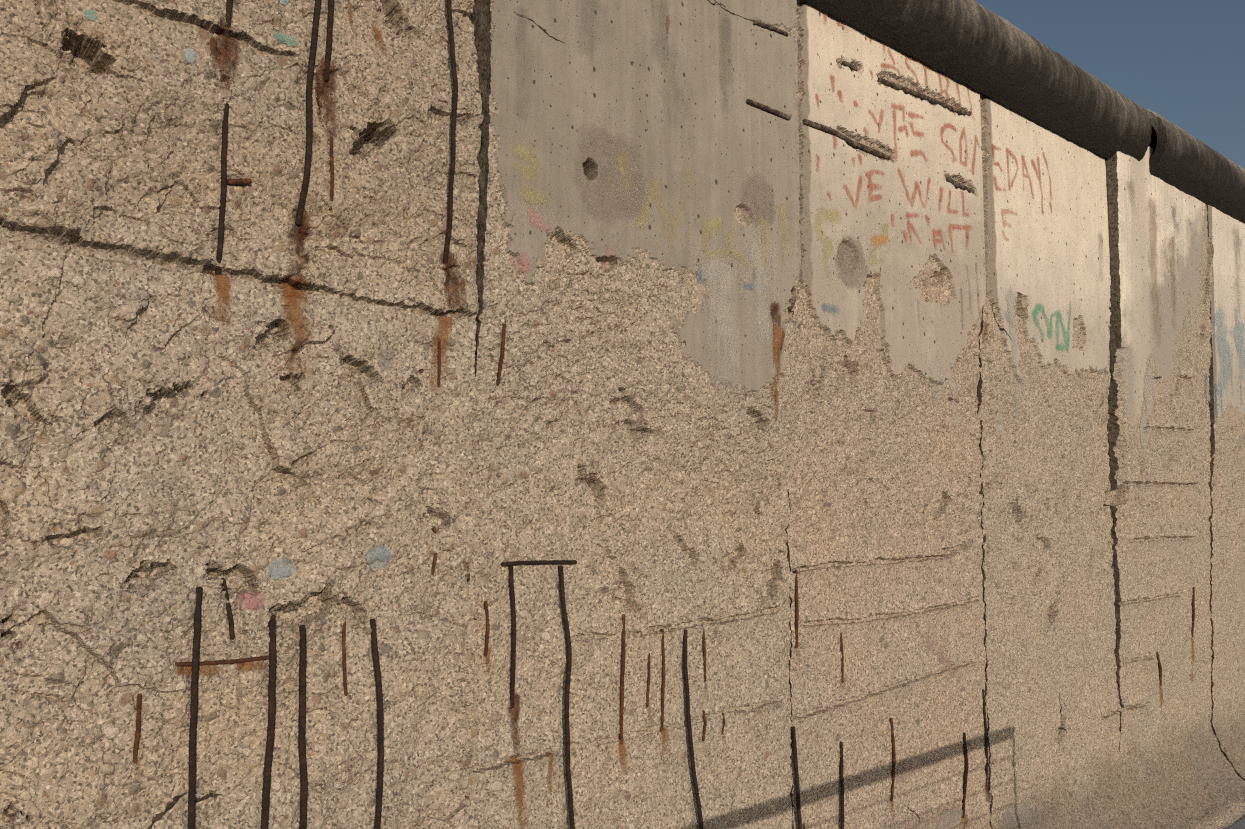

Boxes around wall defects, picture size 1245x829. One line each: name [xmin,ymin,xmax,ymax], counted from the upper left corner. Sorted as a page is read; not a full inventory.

rust [209,21,238,86]
rust [315,58,336,137]
spalling [489,92,499,118]
spalling [753,0,806,256]
spalling [876,71,970,118]
spalling [944,92,989,254]
rust [210,269,230,322]
spalling [0,0,484,829]
rust [278,211,311,373]
rust [771,303,785,419]
spalling [467,124,1245,829]
rust [508,693,524,825]